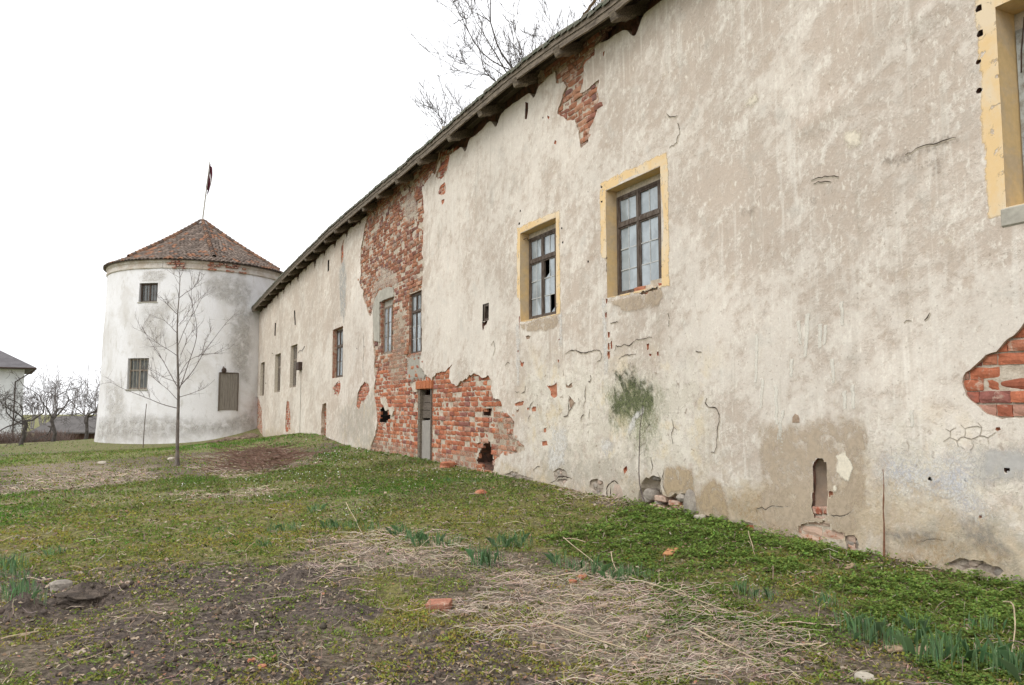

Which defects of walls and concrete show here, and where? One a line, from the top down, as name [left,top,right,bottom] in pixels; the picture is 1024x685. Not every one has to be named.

flaking render [538,26,613,148]
crack [666,113,680,148]
crack [905,137,956,156]
crack [811,175,839,185]
flaking render [356,146,536,481]
crack [564,314,670,422]
flaking render [962,323,1024,431]
crack [705,398,721,454]
crack [943,422,996,451]
peeling [829,451,853,497]
flaking render [790,458,859,550]